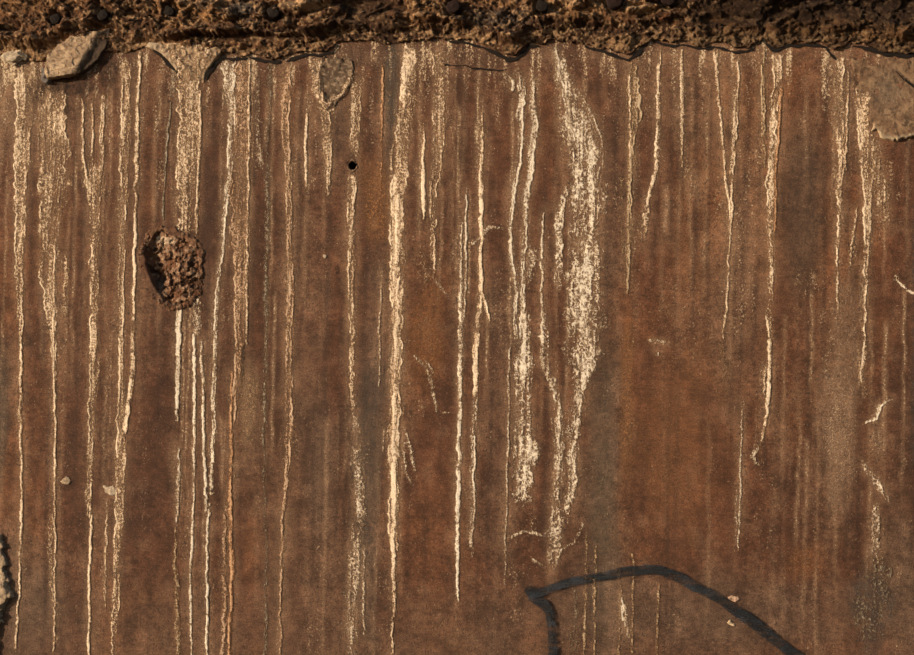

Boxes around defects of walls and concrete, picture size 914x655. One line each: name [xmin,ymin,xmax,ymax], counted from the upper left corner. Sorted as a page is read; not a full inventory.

spalling [0,50,28,66]
peeling [41,28,111,85]
leakage [11,52,142,655]
leakage [160,65,204,237]
leakage [172,55,335,655]
leakage [335,41,662,655]
leakage [679,46,699,190]
efflorescence [711,48,742,393]
crack [585,41,914,88]
efflorescence [734,48,784,551]
efflorescence [832,52,890,398]
spalling [0,534,14,624]